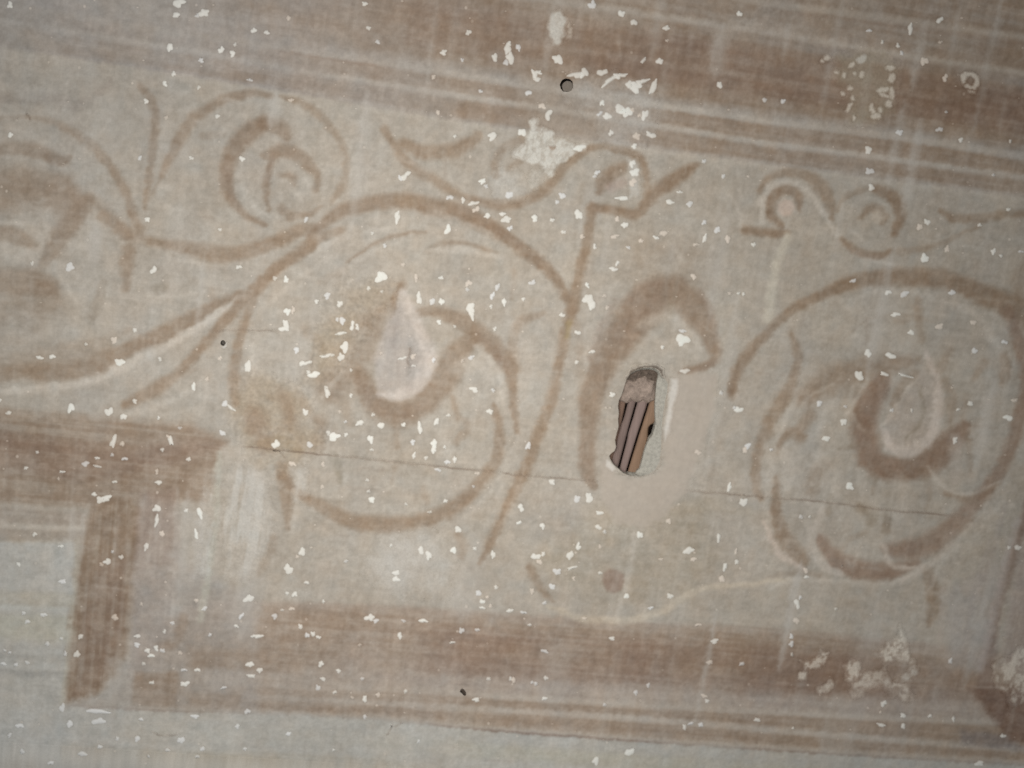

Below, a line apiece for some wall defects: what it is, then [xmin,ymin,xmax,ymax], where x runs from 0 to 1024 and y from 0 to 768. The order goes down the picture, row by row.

flaking render [510,69,590,192]
peeling [545,8,658,201]
peeling [581,282,610,311]
spalling [612,368,668,476]
flaking render [788,595,920,729]
flaking render [991,645,1024,709]